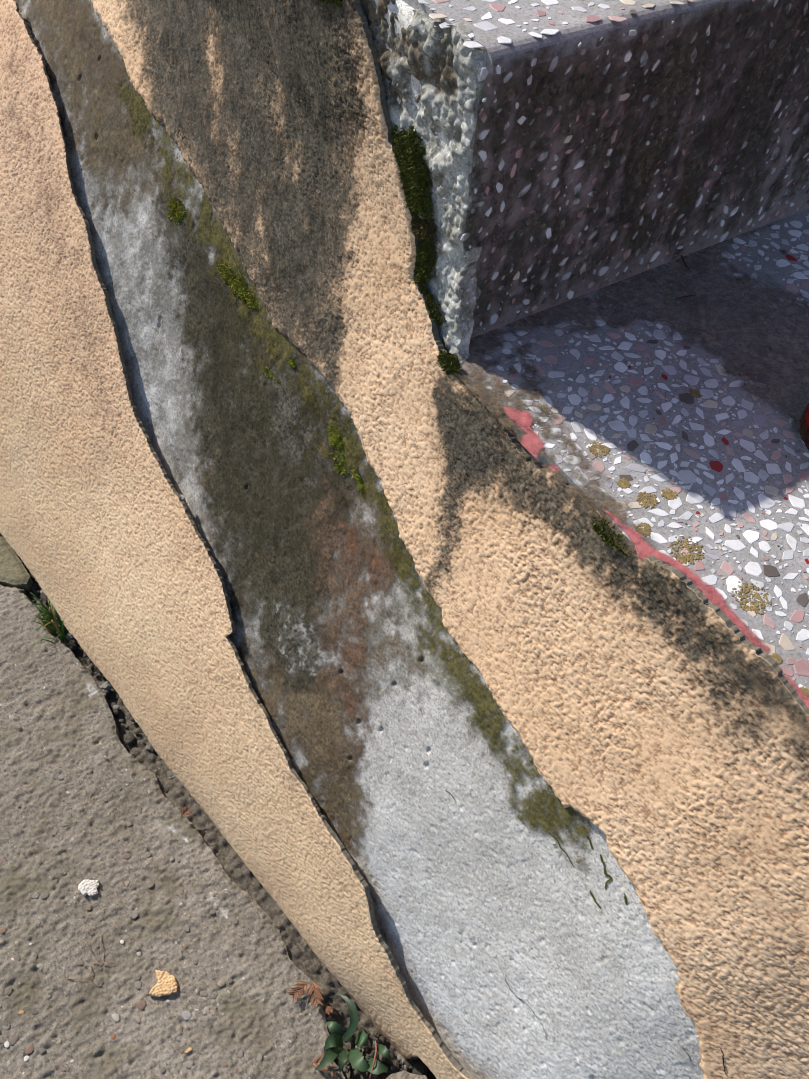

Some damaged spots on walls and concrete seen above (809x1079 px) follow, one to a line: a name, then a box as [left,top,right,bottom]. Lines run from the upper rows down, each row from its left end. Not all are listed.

peeling [16,0,315,778]
damp [15,0,439,855]
peeling [280,338,703,1079]
peeling [418,0,809,688]
damp [425,376,806,738]
damp [788,735,809,777]